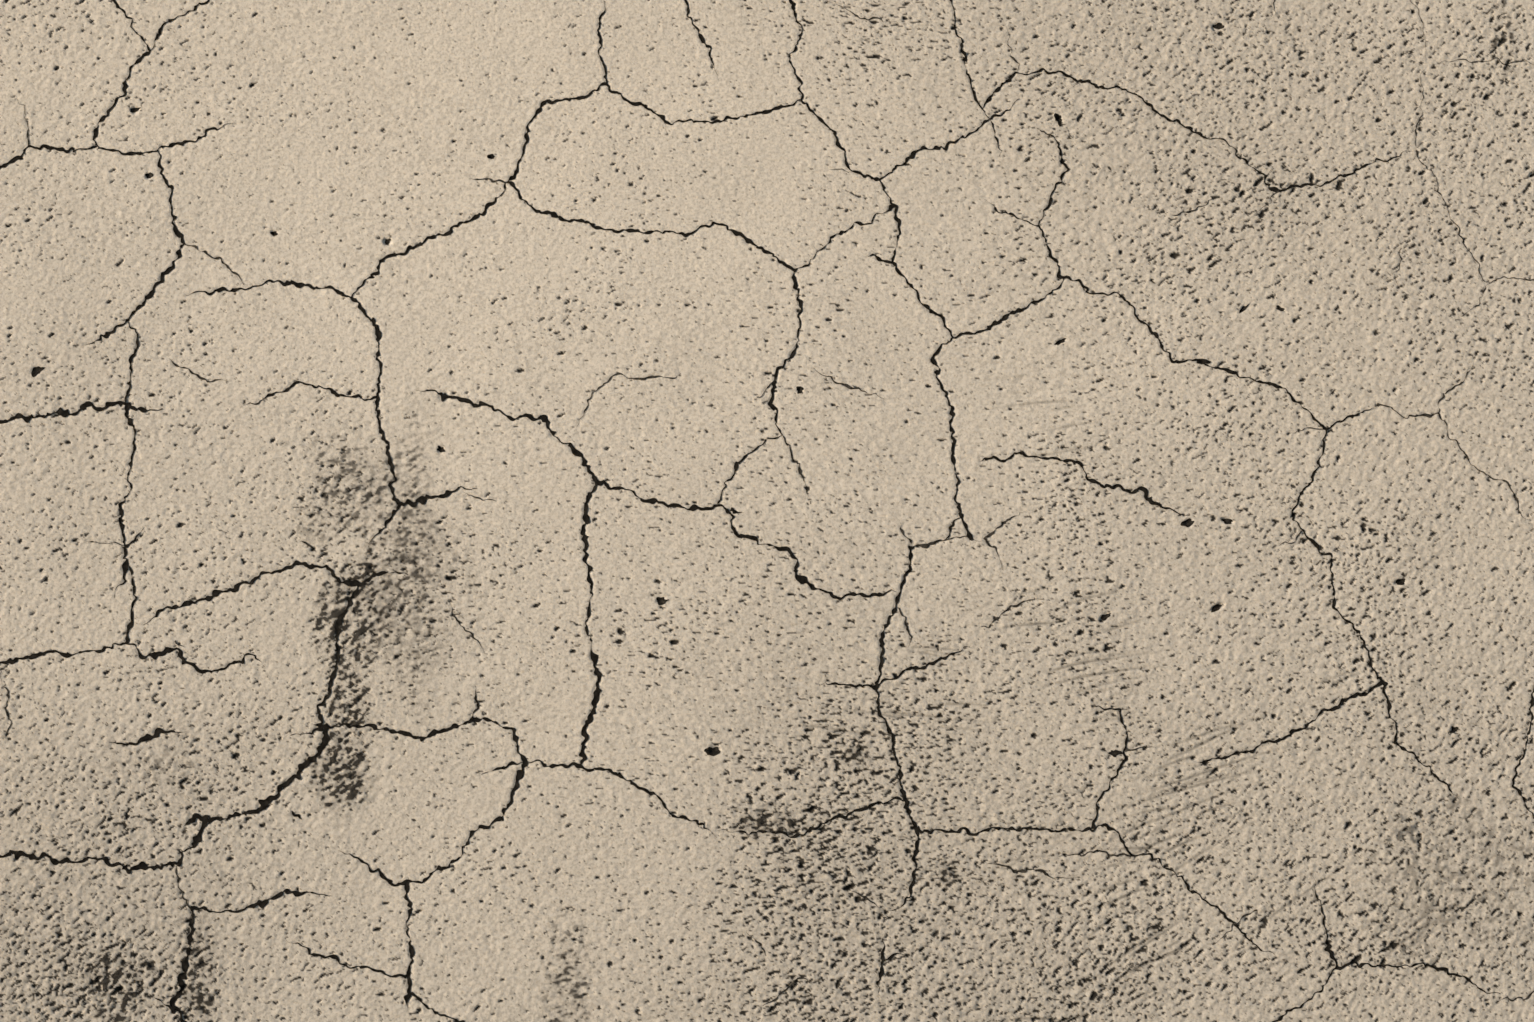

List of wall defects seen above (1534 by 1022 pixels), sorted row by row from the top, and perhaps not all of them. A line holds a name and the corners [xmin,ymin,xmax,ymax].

crack [1410,0,1534,316]
crack [0,0,1404,674]
crack [736,128,1522,959]
crack [0,560,709,1022]
crack [764,977,814,1005]
crack [876,939,904,993]
crack [1272,875,1534,1022]
crack [1512,688,1534,819]